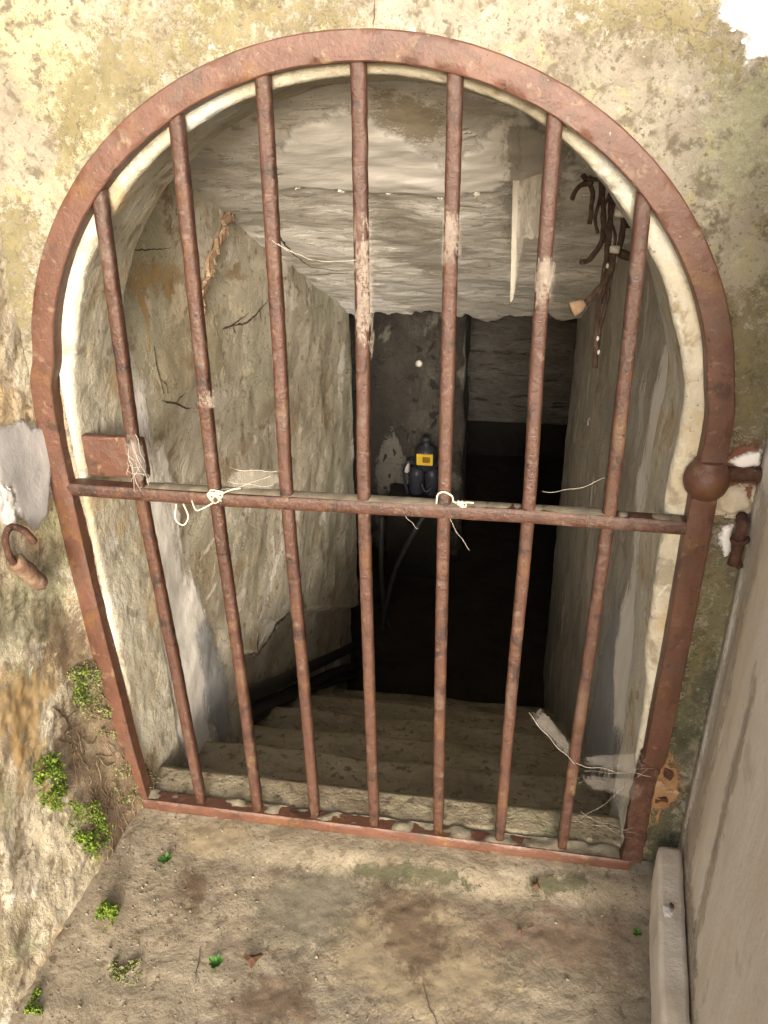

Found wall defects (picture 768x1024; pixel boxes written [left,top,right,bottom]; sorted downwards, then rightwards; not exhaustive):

crack [222,299,269,333]
crack [154,347,190,409]
peeling [0,484,17,525]
rust [647,752,682,830]